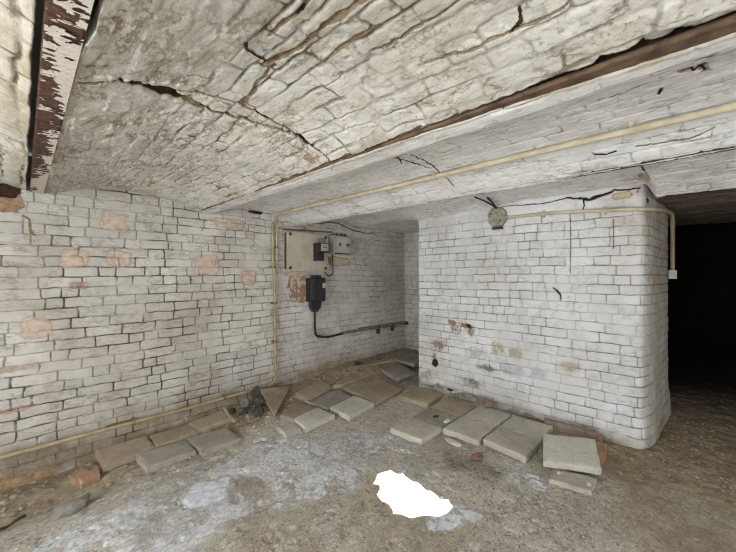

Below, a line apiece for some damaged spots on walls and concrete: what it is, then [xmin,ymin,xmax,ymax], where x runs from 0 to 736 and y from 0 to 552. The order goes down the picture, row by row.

crack [323,0,460,63]
crack [423,0,570,64]
peeling [30,0,94,194]
crack [78,0,367,161]
crack [581,83,662,106]
crack [635,127,714,147]
crack [393,154,454,186]
spalling [0,183,36,236]
spalling [285,272,310,303]